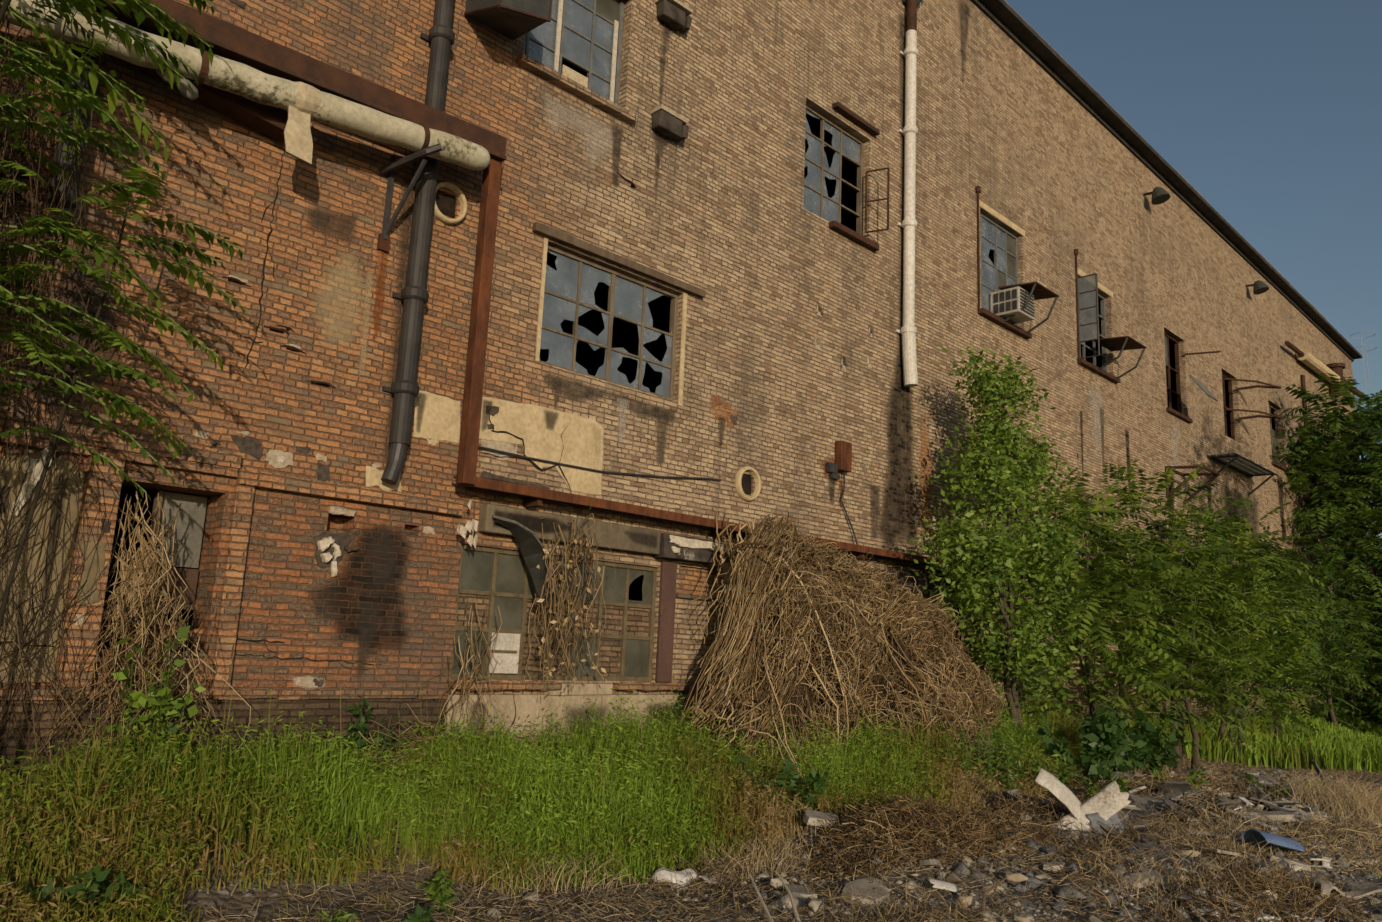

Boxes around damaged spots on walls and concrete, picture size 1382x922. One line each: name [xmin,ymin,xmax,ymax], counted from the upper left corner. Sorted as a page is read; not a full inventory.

crack [244,153,284,369]
leakage [871,16,916,550]
spalling [194,430,330,482]
peeling [479,397,604,496]
leakage [314,527,407,674]